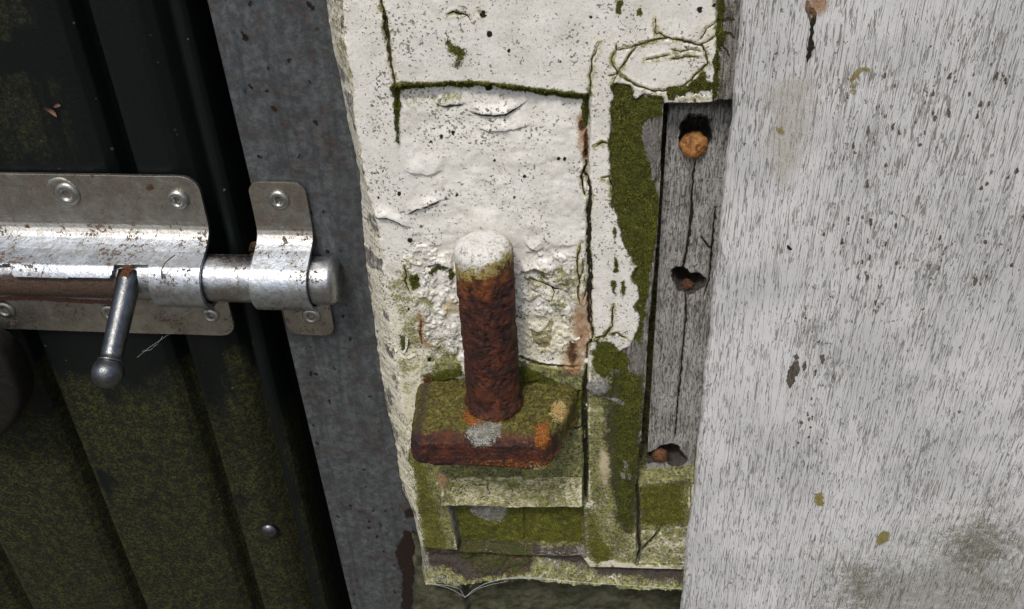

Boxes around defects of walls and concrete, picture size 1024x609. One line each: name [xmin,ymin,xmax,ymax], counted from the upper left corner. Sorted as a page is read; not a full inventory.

crack [589,18,717,92]
rust [578,114,589,159]
peeling [395,333,416,359]
rust [418,311,431,349]
peeling [531,321,580,348]
crack [519,142,625,497]
rust [563,294,592,374]
rust [529,399,569,470]